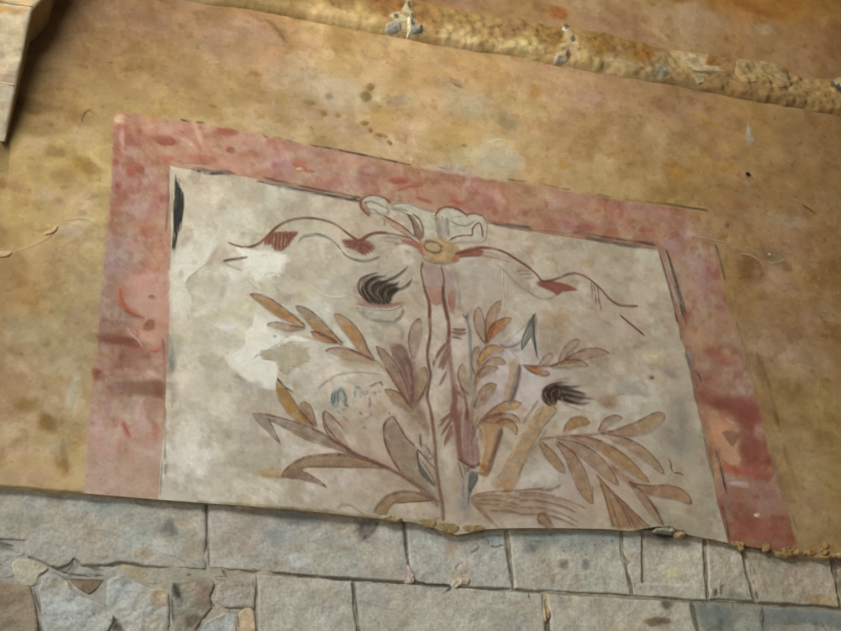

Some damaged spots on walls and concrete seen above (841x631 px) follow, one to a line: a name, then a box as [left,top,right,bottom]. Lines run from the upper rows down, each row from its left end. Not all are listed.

spalling [385,0,424,39]
spalling [554,23,581,69]
spalling [679,52,721,83]
peeling [169,245,214,313]
peeling [227,318,308,388]